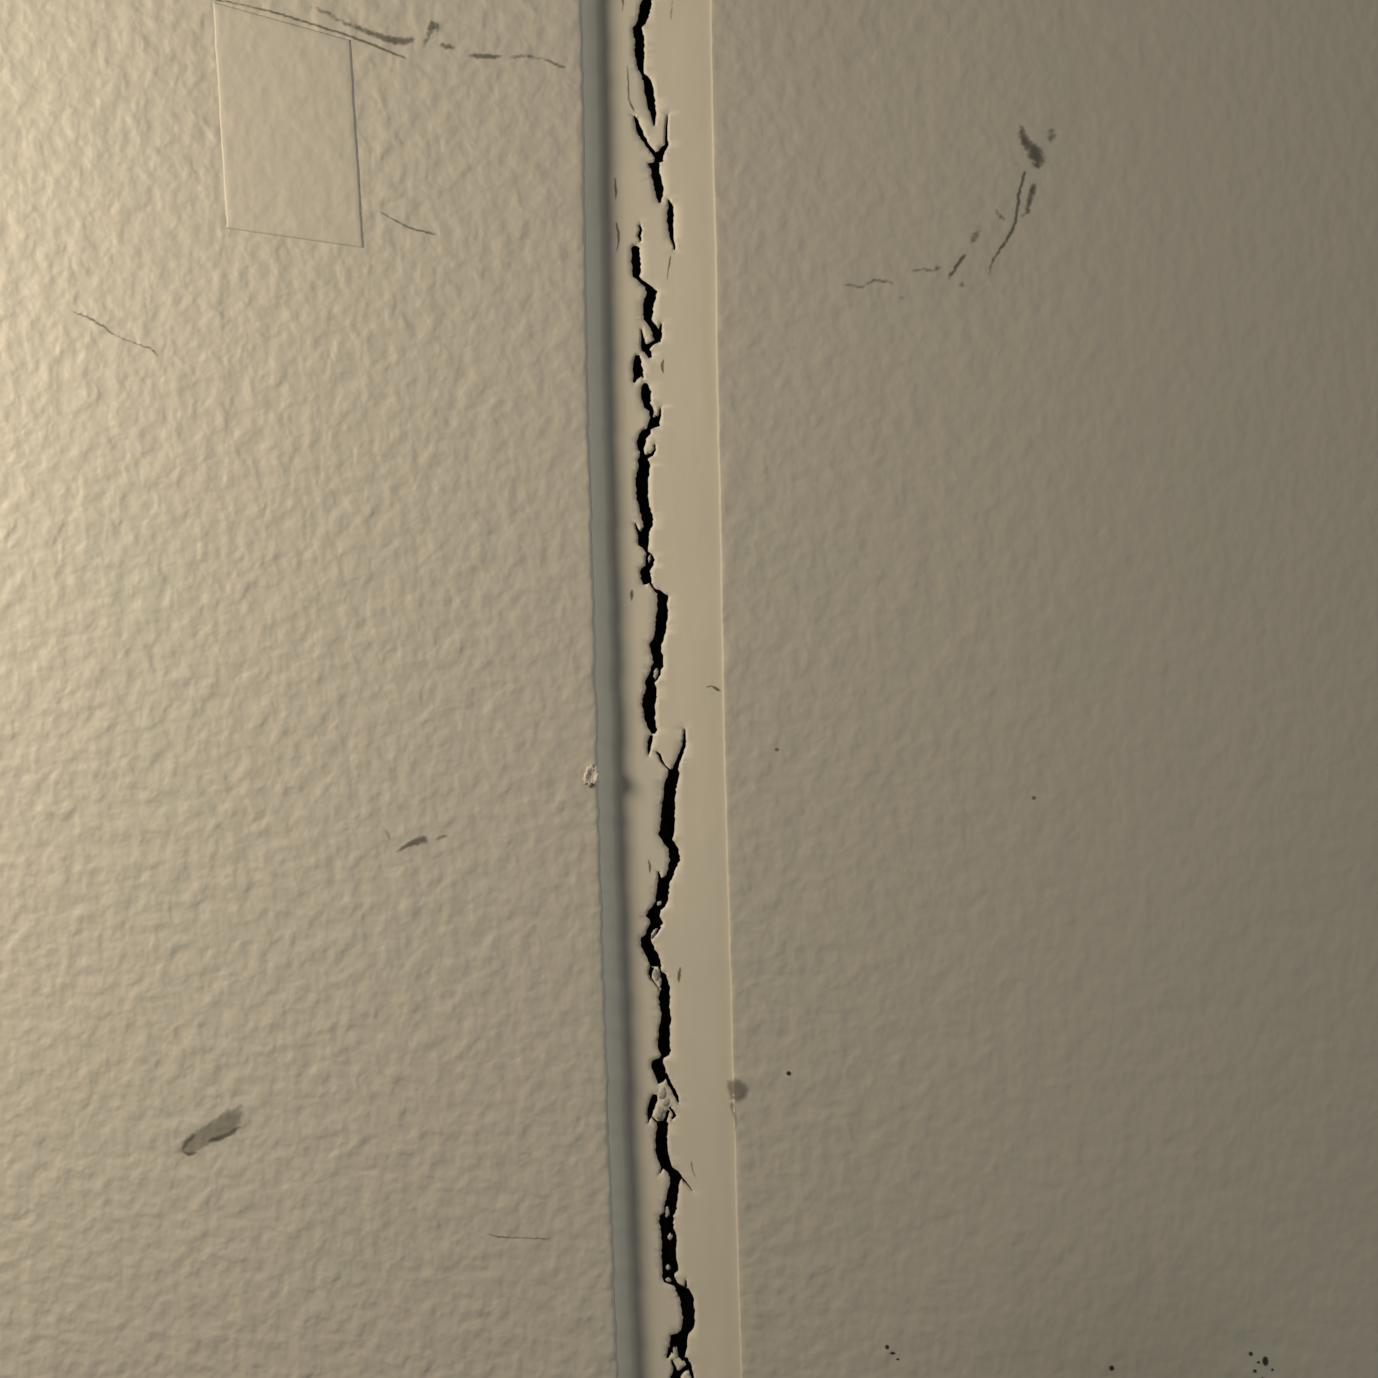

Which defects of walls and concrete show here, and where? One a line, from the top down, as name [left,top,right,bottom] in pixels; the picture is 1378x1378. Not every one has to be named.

crack [615,0,695,1378]
crack [950,130,1041,275]